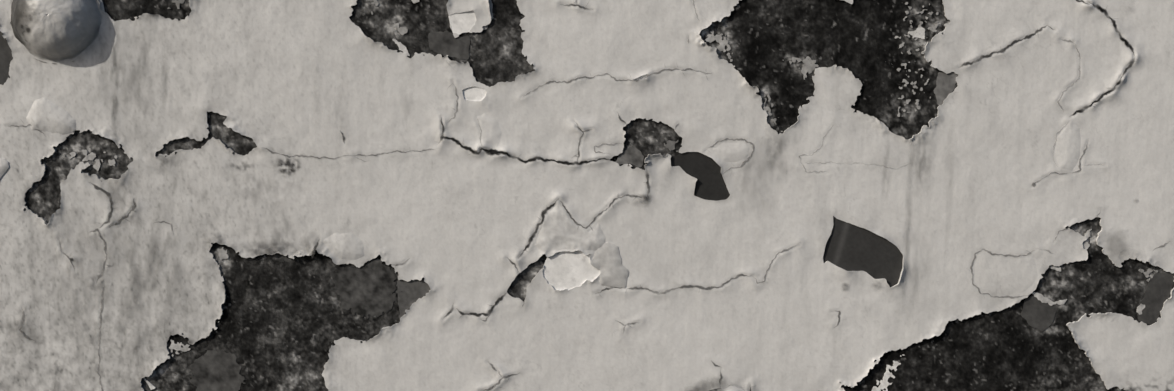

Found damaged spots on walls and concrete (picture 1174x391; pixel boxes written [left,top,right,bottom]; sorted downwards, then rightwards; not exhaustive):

peeling [448,10,476,35]
crack [526,14,697,95]
crack [962,27,1052,66]
crack [1058,0,1134,115]
crack [267,93,625,165]
peeling [671,152,730,201]
crack [711,138,754,168]
crack [445,294,505,321]
crack [509,174,650,268]
crack [602,248,791,293]
peeling [823,216,903,288]
corrosion [841,217,1174,391]